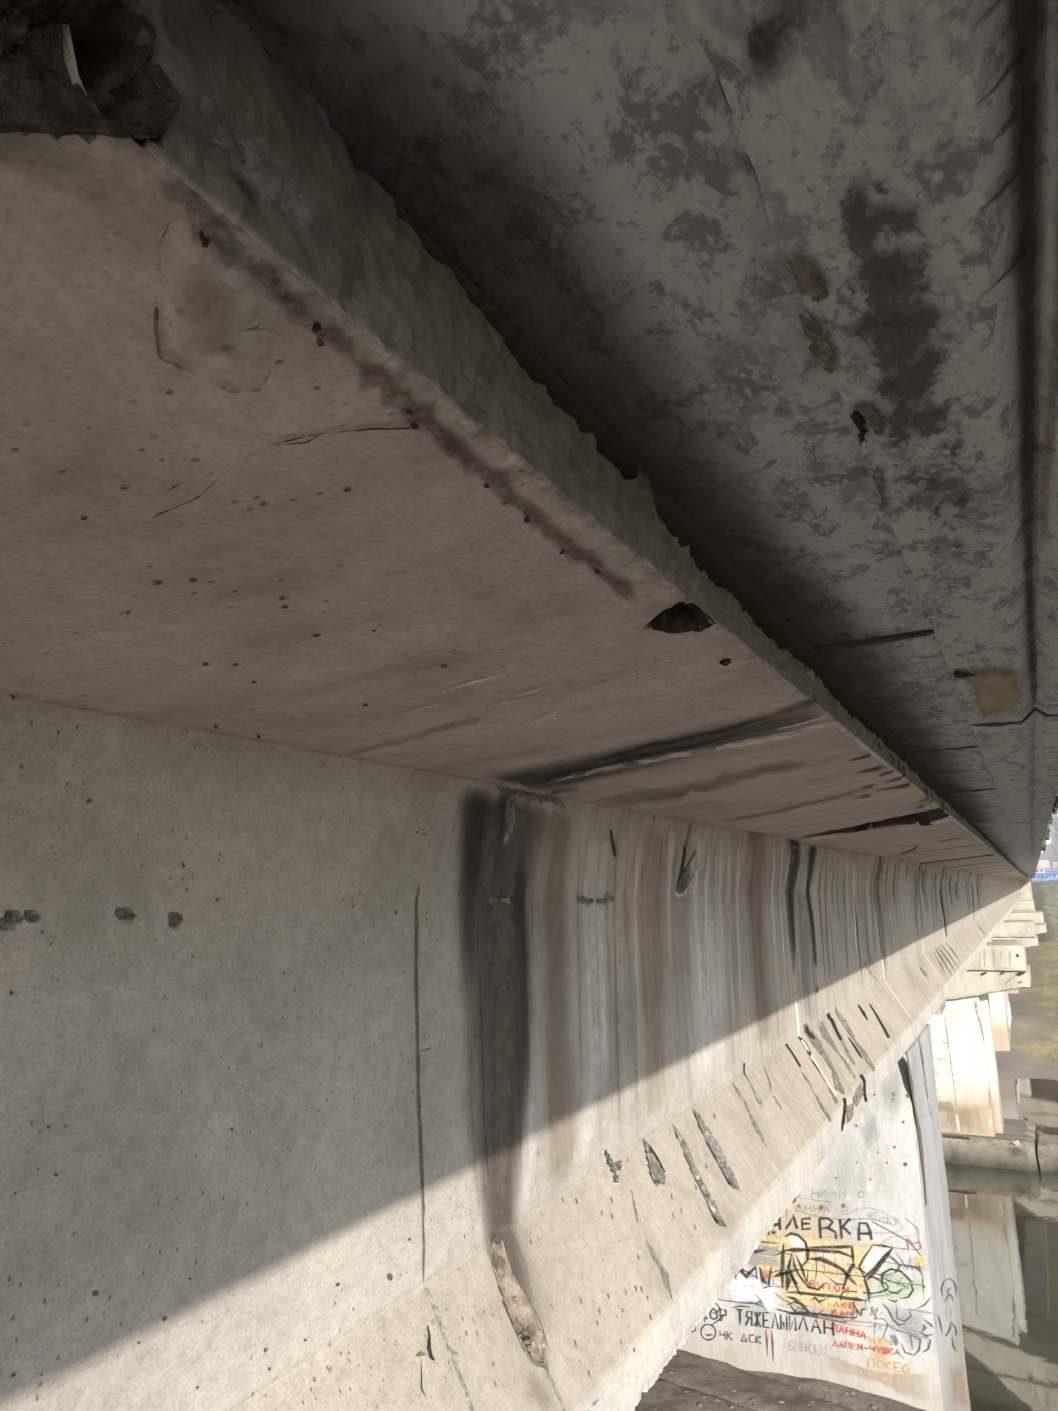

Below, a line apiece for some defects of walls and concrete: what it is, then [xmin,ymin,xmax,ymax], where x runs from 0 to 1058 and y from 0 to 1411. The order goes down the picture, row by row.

spalling [0,0,319,232]
leakage [215,0,993,818]
leakage [953,0,1058,727]
spalling [645,602,716,634]
crack [415,886,474,1411]
crack [476,920,487,1165]
spalling [601,1150,638,1222]
leakage [466,700,823,1301]
spalling [643,1139,682,1218]
spalling [669,1107,740,1227]
spalling [786,1004,909,1127]
spalling [490,1233,566,1411]